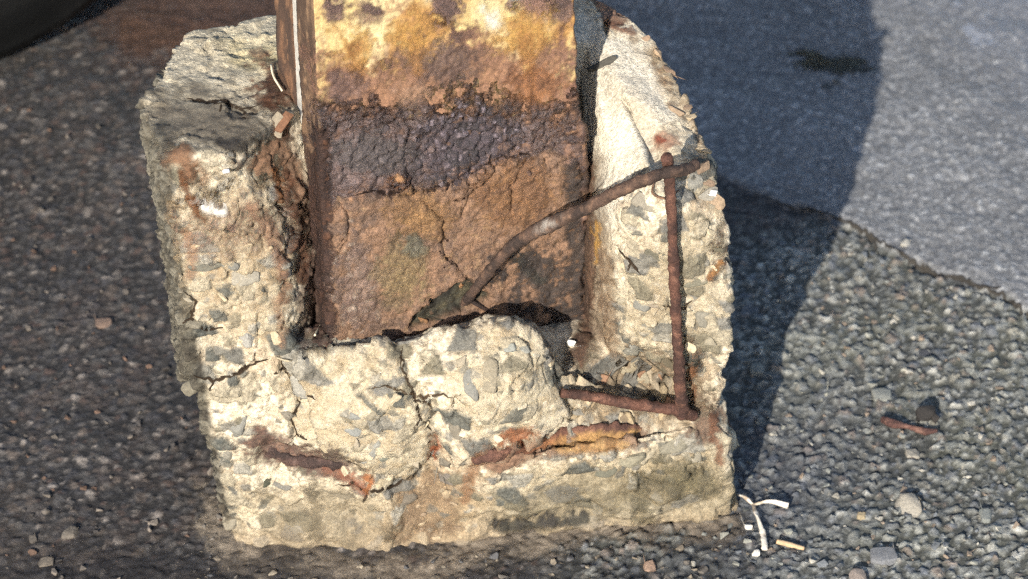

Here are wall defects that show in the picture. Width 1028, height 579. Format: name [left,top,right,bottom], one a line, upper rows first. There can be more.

rust [592,0,636,35]
rust [161,0,586,354]
crack [339,152,540,276]
rust [486,153,611,367]
crack [182,291,223,331]
spalling [448,223,718,443]
crack [193,351,316,444]
crack [372,350,460,431]
rust [242,426,373,494]
crack [335,478,408,503]
rust [476,429,647,474]